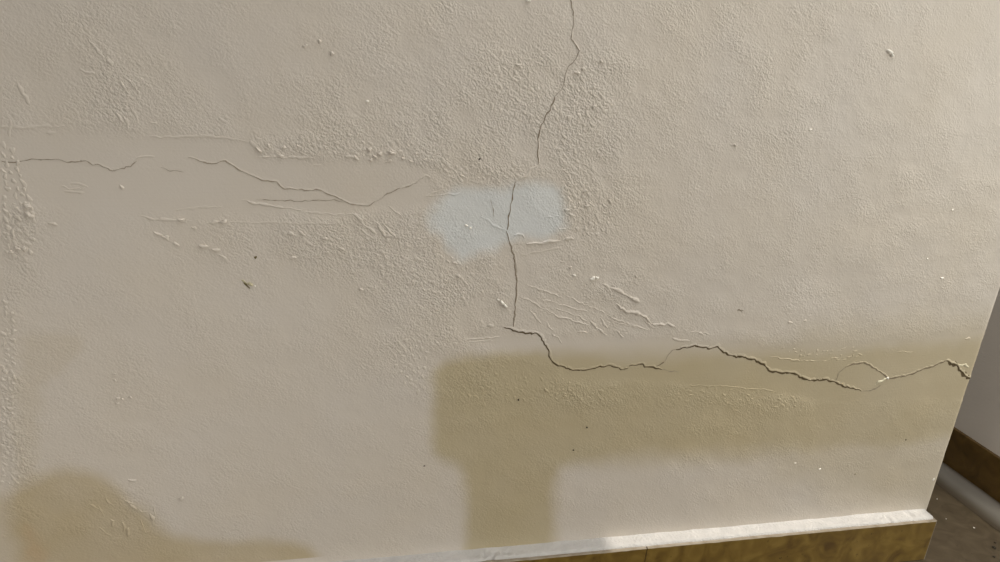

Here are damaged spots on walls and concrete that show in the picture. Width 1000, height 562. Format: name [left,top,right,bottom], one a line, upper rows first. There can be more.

crack [2,155,430,206]
crack [480,0,971,391]